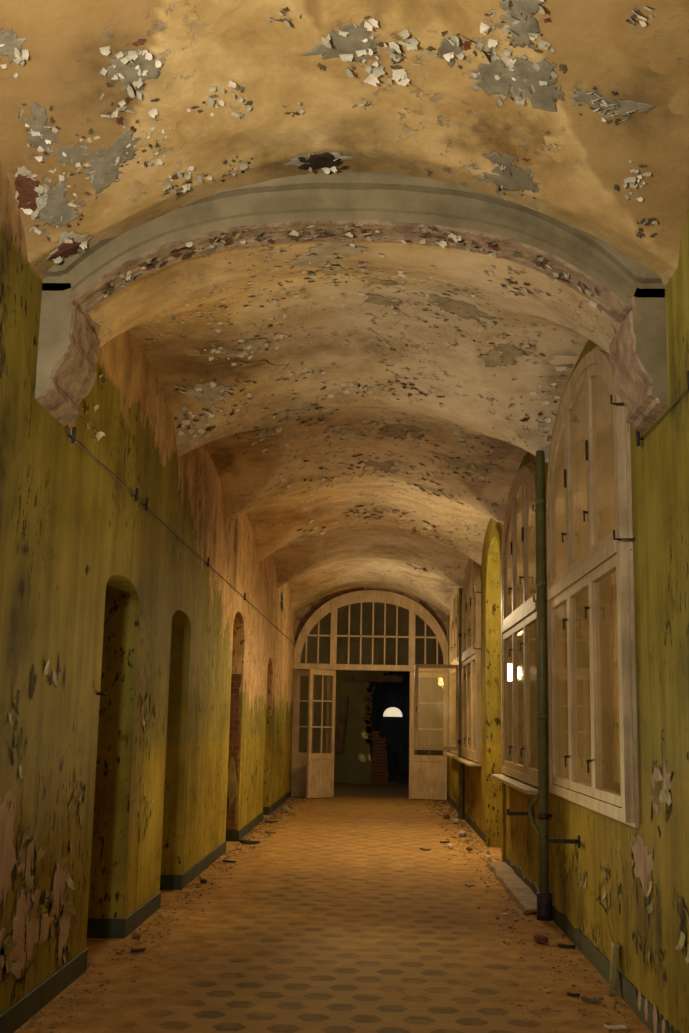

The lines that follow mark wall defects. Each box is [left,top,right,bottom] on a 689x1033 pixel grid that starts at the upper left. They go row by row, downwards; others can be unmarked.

peeling [0,27,30,78]
peeling [187,81,252,119]
peeling [300,0,656,126]
peeling [14,33,171,264]
peeling [162,155,253,195]
flaking render [283,152,354,174]
peeling [472,150,546,202]
peeling [614,160,652,202]
peeling [102,223,552,438]
peeling [228,361,506,509]
peeling [649,759,673,838]
peeling [0,790,78,996]